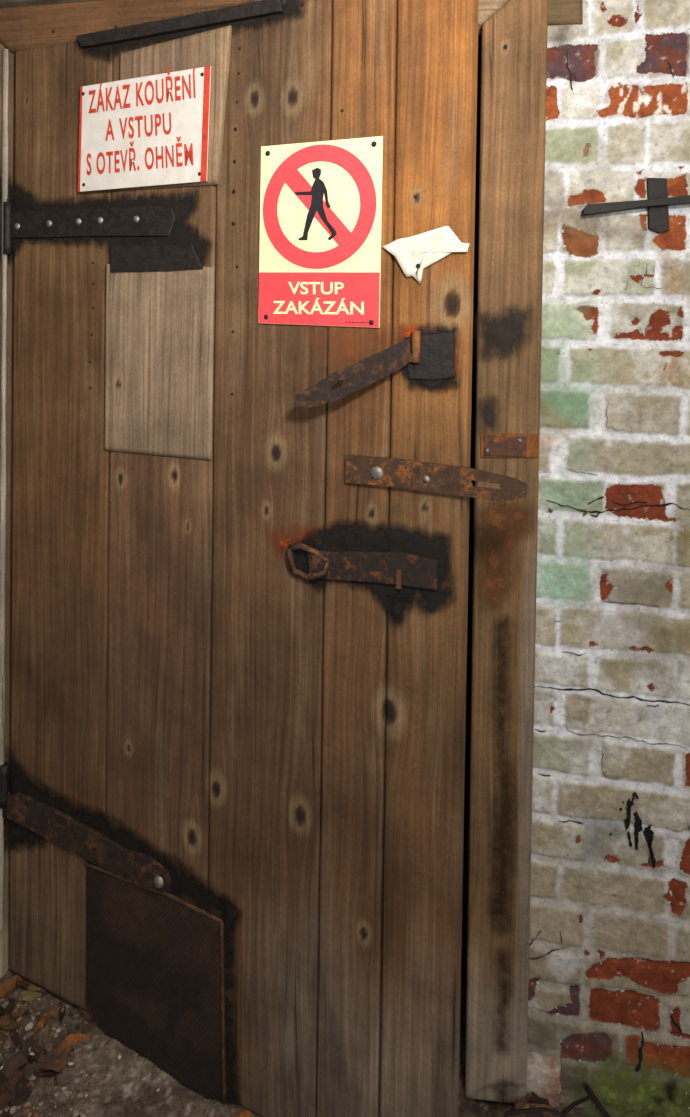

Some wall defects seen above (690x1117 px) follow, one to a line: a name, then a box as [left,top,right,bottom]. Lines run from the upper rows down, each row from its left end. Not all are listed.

peeling [546,43,600,121]
peeling [596,1,688,118]
peeling [567,189,608,209]
peeling [561,224,599,259]
peeling [639,214,688,251]
peeling [574,289,601,351]
peeling [613,307,686,371]
crack [539,468,689,517]
peeling [604,482,677,523]
crack [534,686,690,707]
crack [535,726,689,781]
peeling [547,948,690,1110]